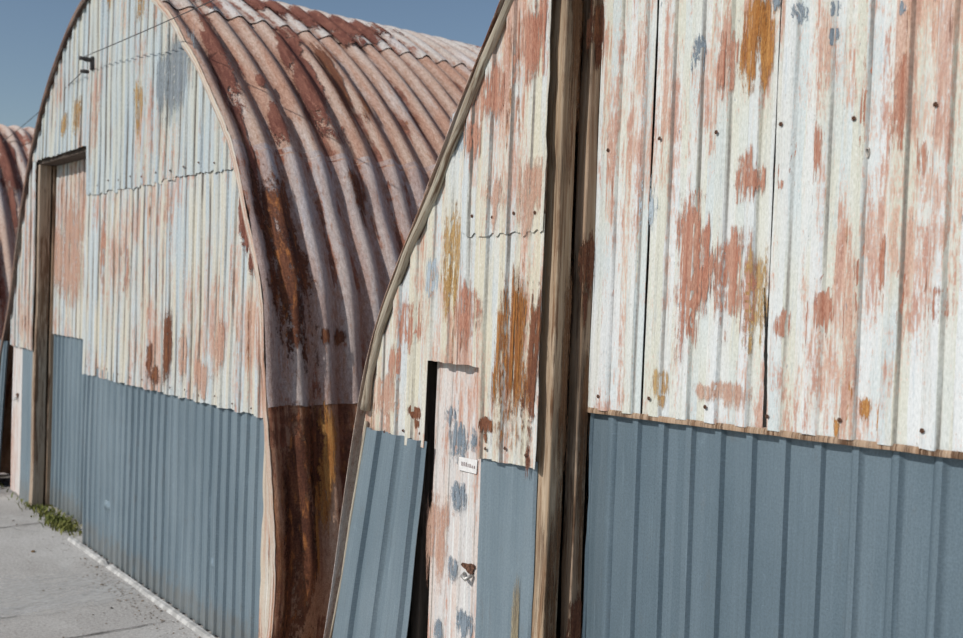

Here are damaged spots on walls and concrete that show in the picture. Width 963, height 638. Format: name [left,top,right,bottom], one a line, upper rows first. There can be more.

corrosion [242,0,404,144]
corrosion [463,0,549,160]
peeling [691,33,706,73]
peeling [770,0,808,24]
peeling [829,28,839,45]
corrosion [0,133,23,233]
corrosion [192,0,346,376]
corrosion [517,157,545,235]
peeling [639,176,658,231]
corrosion [278,401,338,638]